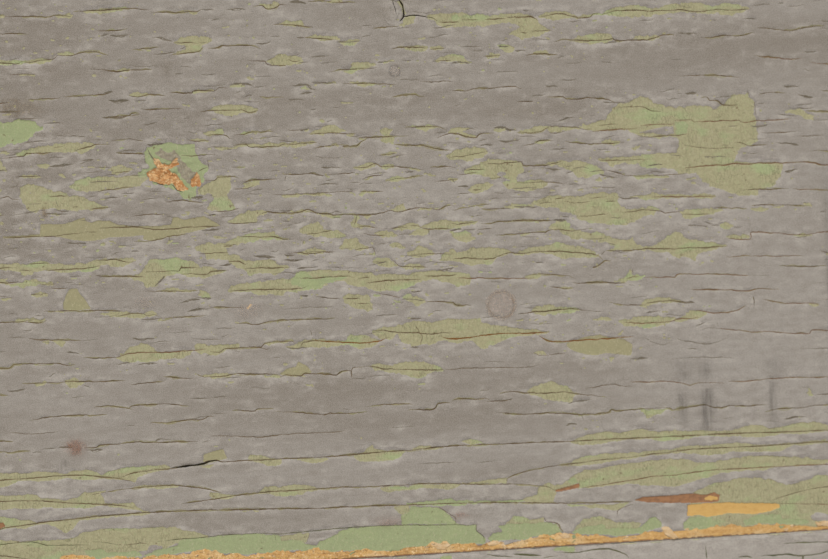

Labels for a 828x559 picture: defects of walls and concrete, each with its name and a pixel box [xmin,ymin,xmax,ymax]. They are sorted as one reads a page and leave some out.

peeling [0,89,783,394]
crack [0,0,828,370]
crack [0,276,828,531]
peeling [527,381,575,404]
crack [158,525,404,542]